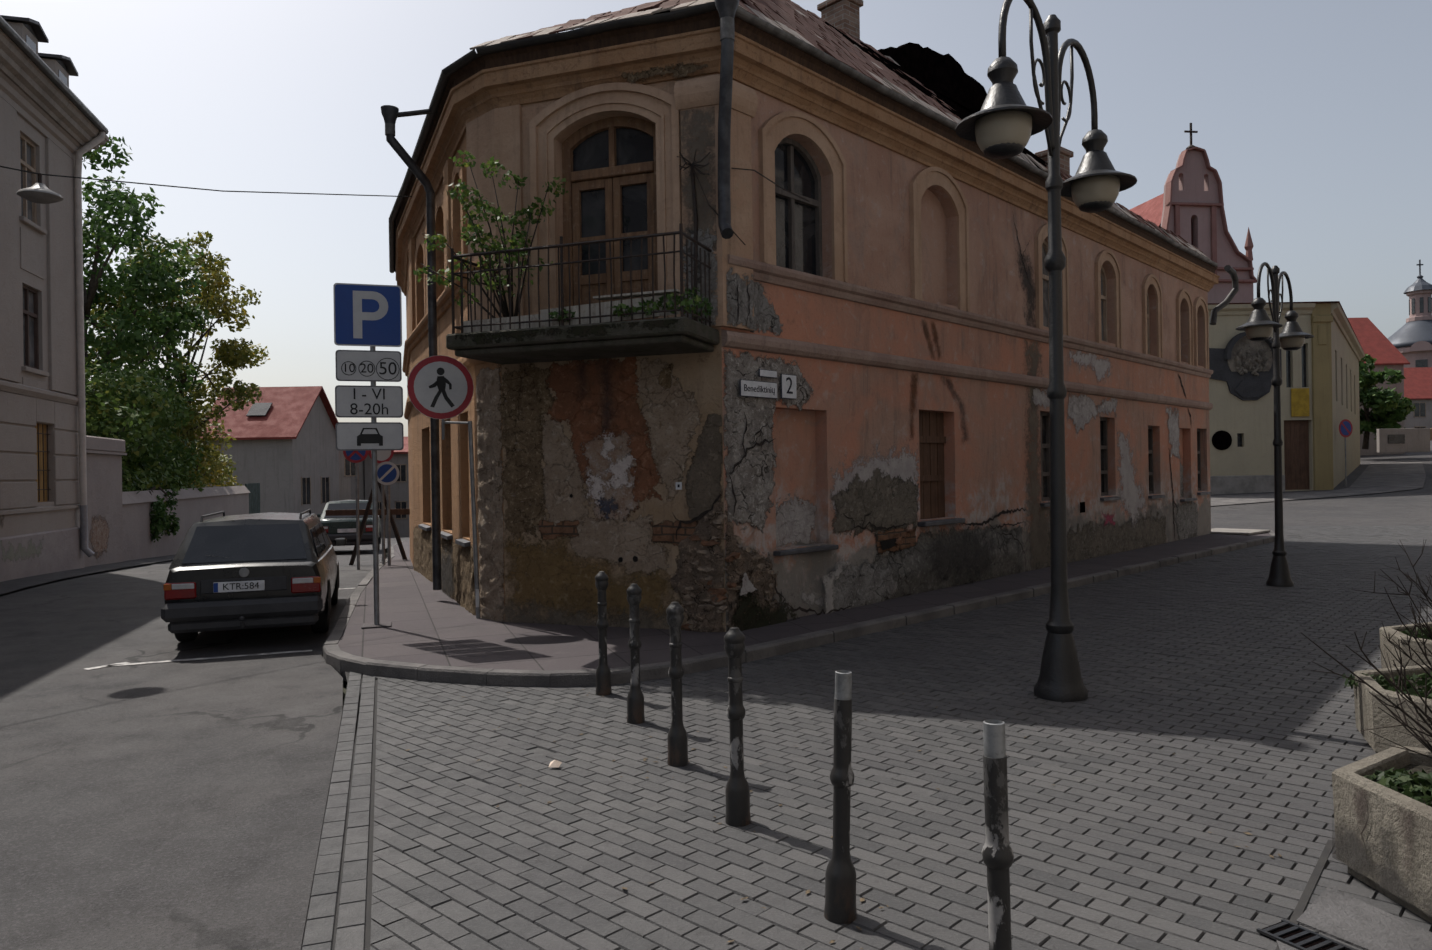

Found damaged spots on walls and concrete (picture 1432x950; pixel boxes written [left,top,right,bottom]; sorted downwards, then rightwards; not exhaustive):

flaking render [683,228,783,336]
peeling [413,349,814,632]
crack [672,412,774,540]
flaking render [825,468,920,612]